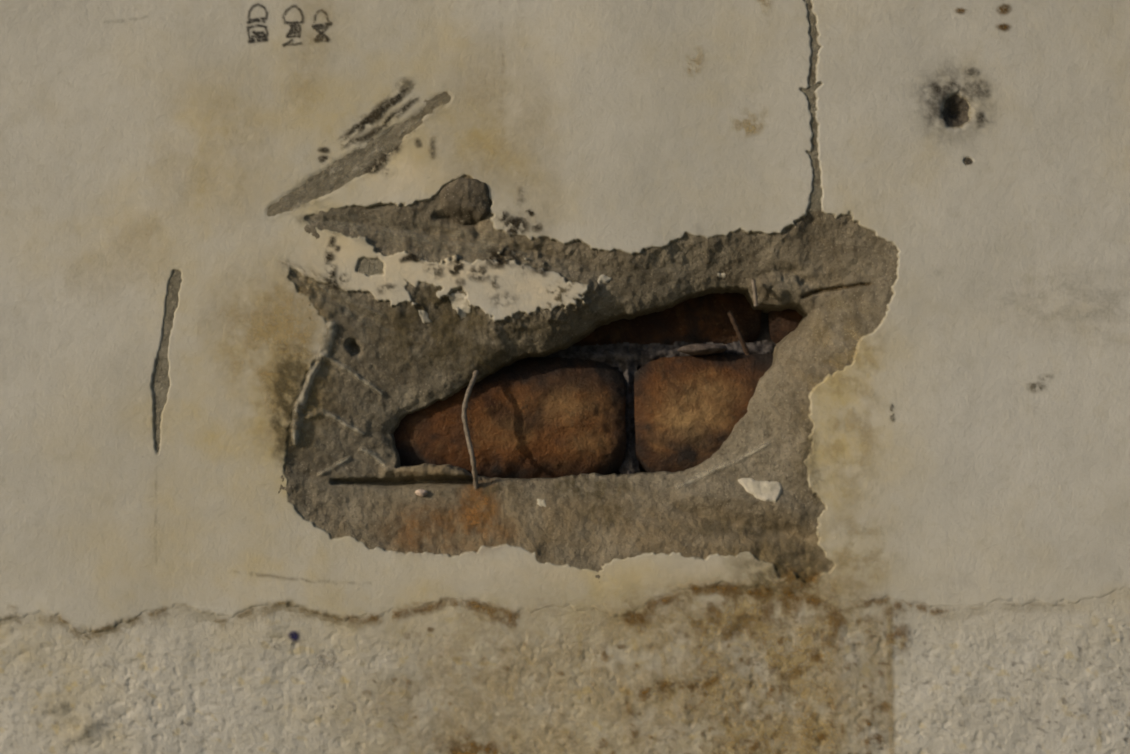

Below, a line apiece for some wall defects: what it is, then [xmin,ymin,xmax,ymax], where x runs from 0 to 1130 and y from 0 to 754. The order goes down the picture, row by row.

crack [800,0,822,215]
spalling [942,95,969,127]
spalling [267,92,898,583]
crack [59,609,165,636]
rust [450,742,497,754]
damp [683,570,838,754]